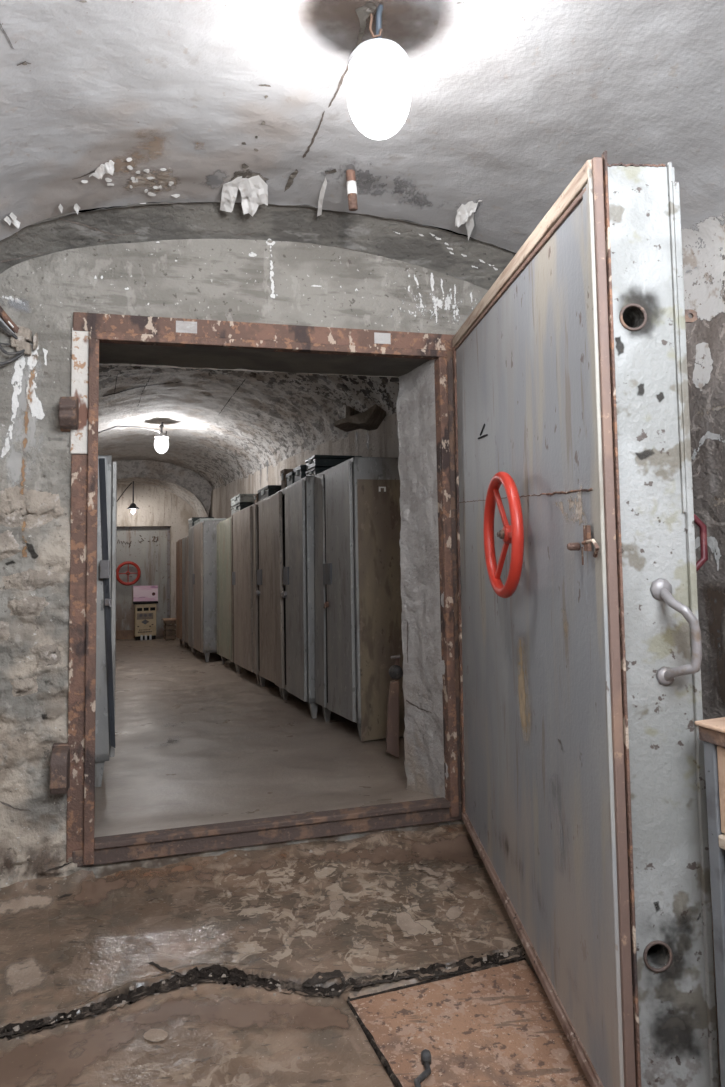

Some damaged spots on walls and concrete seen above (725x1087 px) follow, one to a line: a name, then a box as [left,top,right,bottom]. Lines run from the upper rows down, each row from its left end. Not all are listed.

flaking render [74,158,180,204]
flaking render [4,213,20,229]
leakage [266,238,277,298]
peeling [681,213,725,321]
peeling [692,342,713,391]
leakage [691,431,725,460]
leakage [695,536,721,571]
leakage [705,585,725,705]
crack [0,945,525,1040]